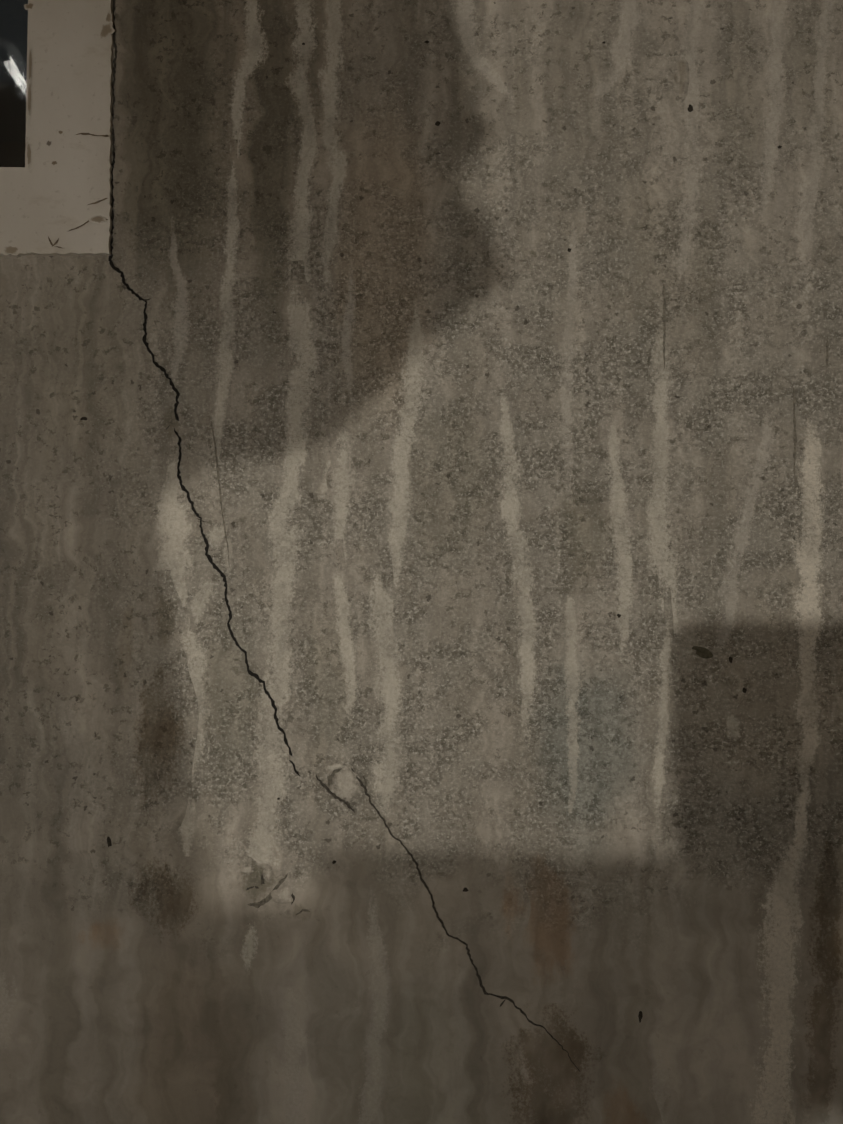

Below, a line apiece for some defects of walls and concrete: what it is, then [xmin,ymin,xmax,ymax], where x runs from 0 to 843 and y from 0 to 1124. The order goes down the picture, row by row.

efflorescence [443,0,518,147]
water stain [588,0,650,156]
efflorescence [753,0,841,321]
water stain [107,0,434,1124]
crack [108,0,580,1071]
efflorescence [494,364,588,826]
water stain [554,193,583,550]
water stain [601,0,713,860]
water stain [709,384,778,744]
water stain [732,396,843,1124]
water stain [482,979,623,1124]